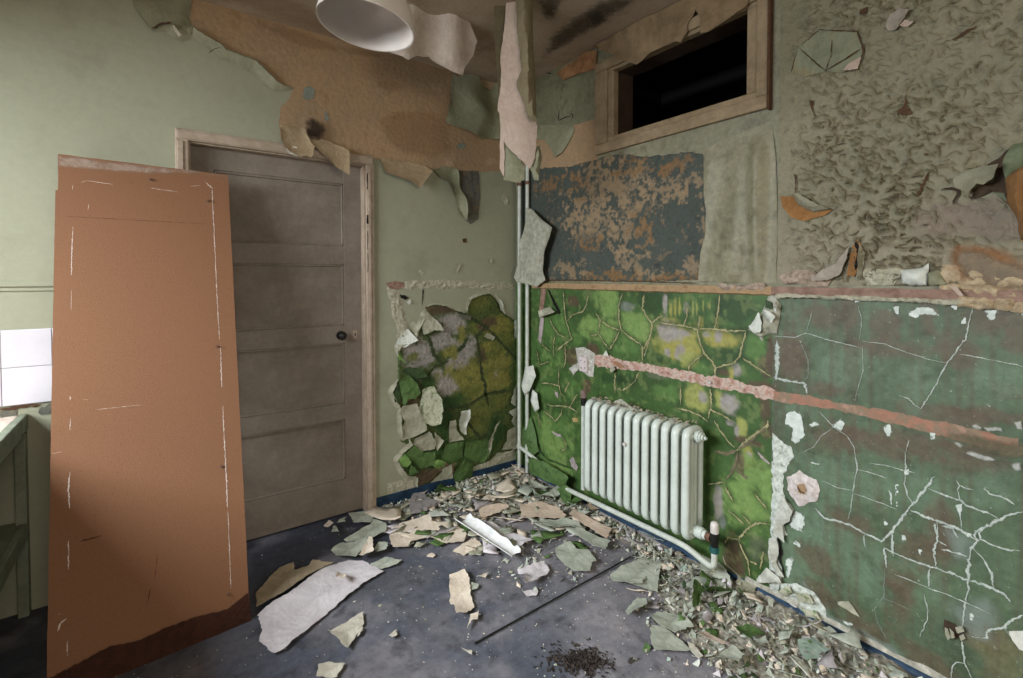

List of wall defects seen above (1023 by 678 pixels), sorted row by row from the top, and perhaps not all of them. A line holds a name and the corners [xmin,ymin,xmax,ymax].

flaking render [190,0,501,224]
peeling [777,0,1023,296]
peeling [388,291,612,571]
crack [537,280,1023,678]
spalling [756,433,836,637]